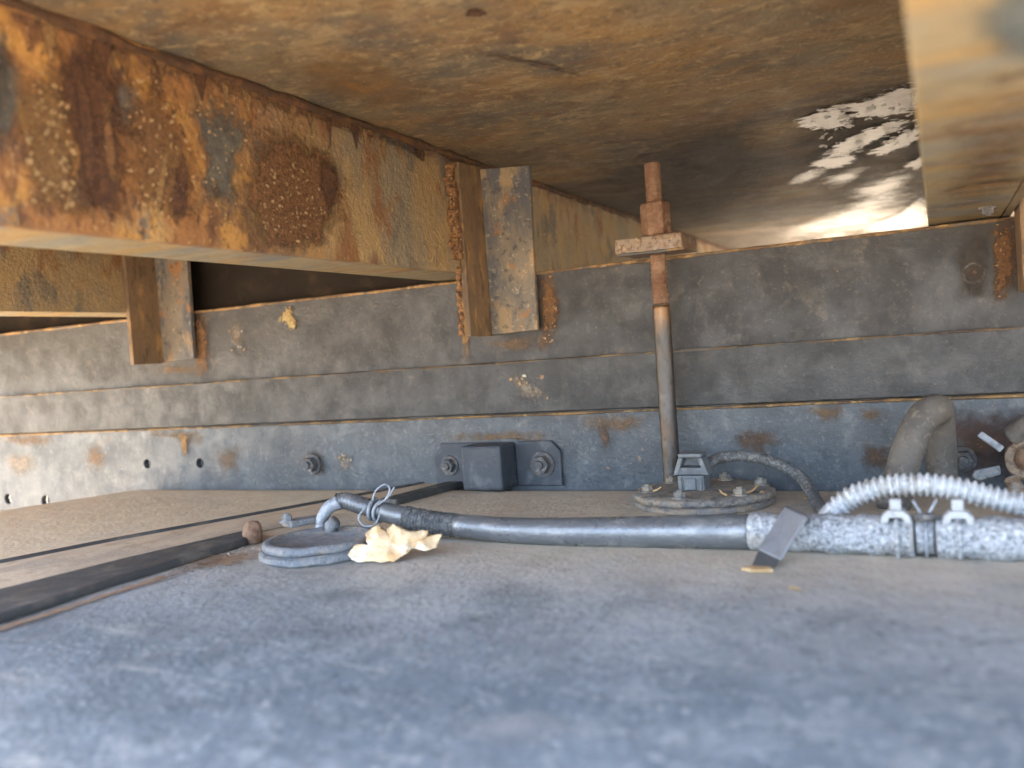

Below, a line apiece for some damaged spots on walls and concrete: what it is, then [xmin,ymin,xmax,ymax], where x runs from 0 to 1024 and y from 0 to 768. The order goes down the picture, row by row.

corrosion [17,20,425,251]
peeling [788,82,929,237]
peeling [278,306,297,331]
corrosion [0,163,655,398]
peeling [509,374,548,399]
corrosion [536,216,1016,346]